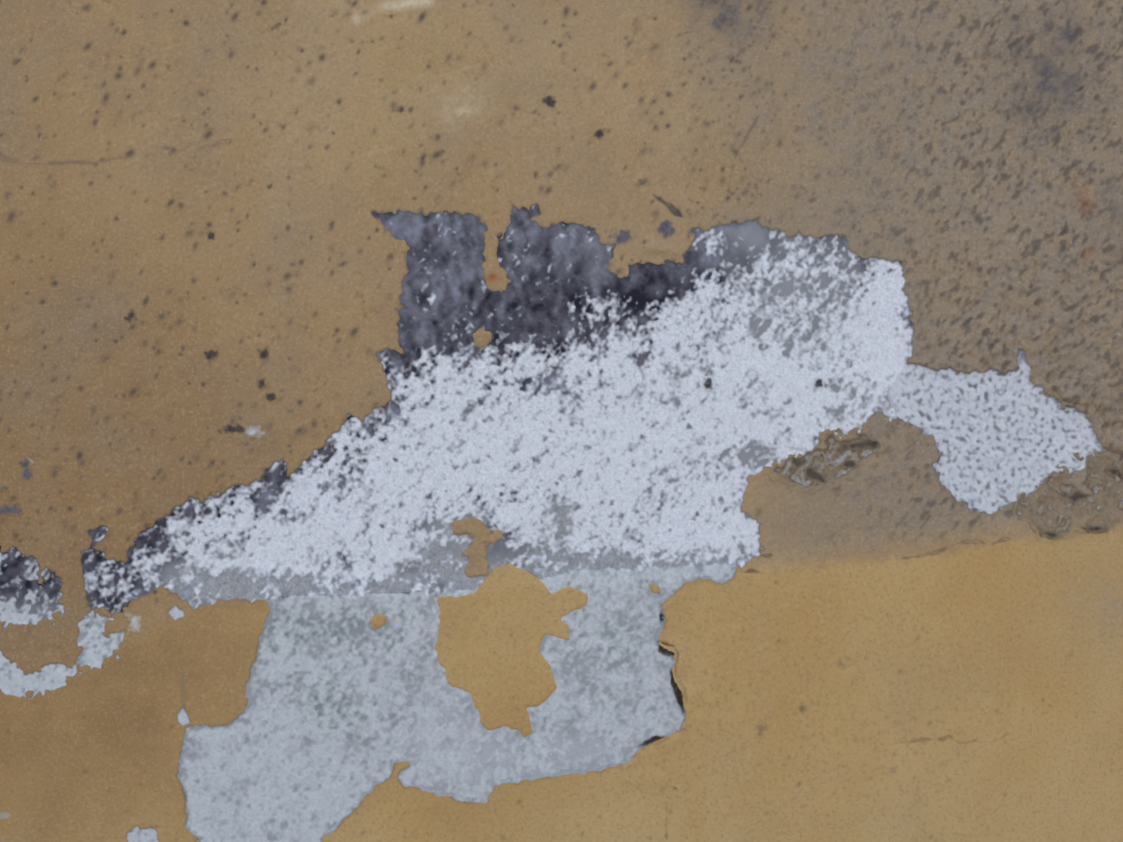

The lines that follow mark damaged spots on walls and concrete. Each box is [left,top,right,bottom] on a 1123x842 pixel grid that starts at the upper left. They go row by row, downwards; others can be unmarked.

peeling [0,204,1123,842]